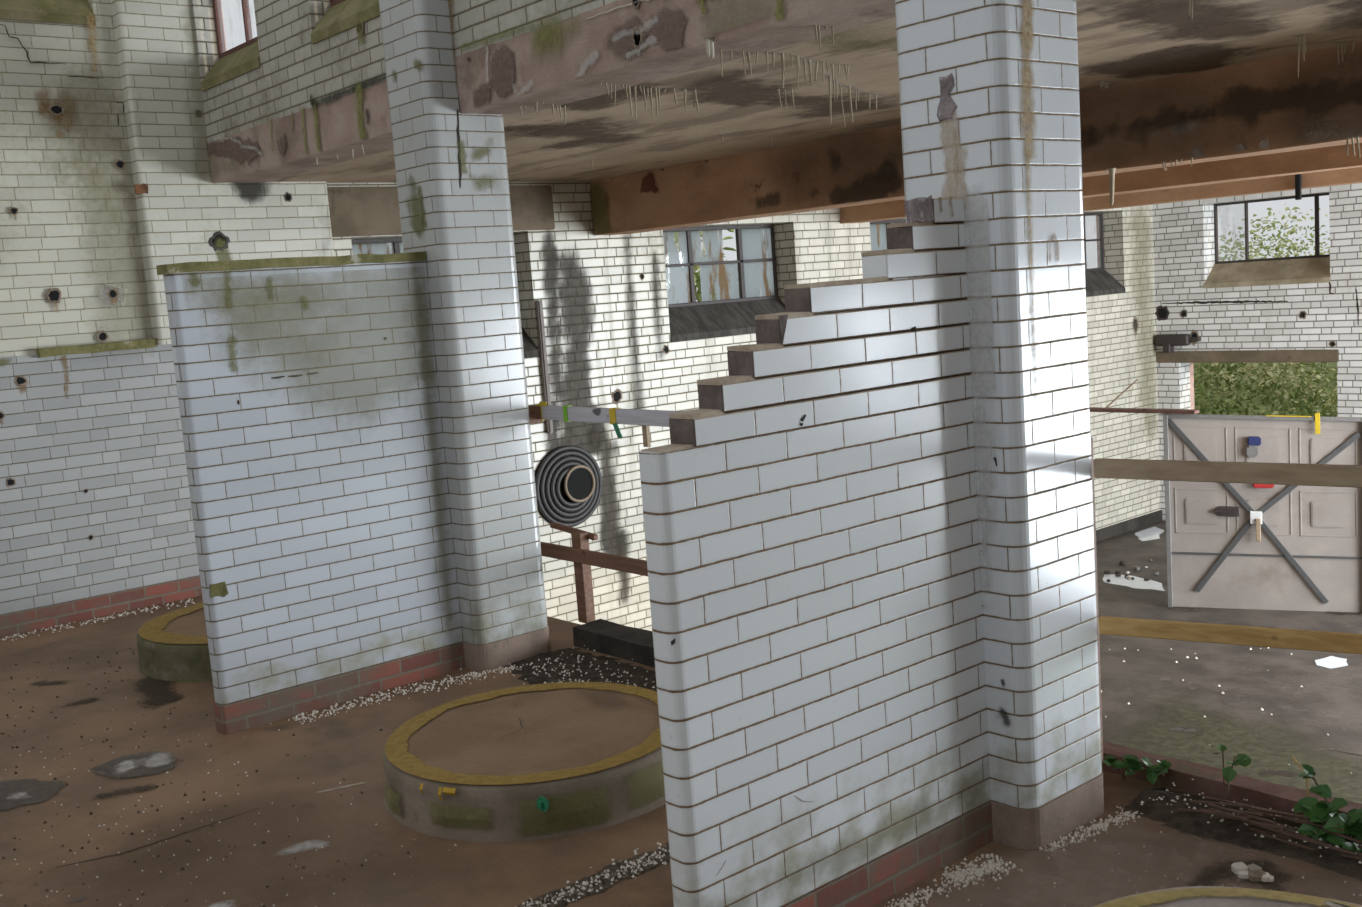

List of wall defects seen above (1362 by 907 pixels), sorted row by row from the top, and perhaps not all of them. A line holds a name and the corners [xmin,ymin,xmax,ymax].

damp [613,17,657,58]
peeling [606,0,687,61]
crack [0,24,124,125]
peeling [473,45,514,107]
spalling [937,73,957,123]
peeling [206,137,260,165]
rust [1021,0,1035,355]